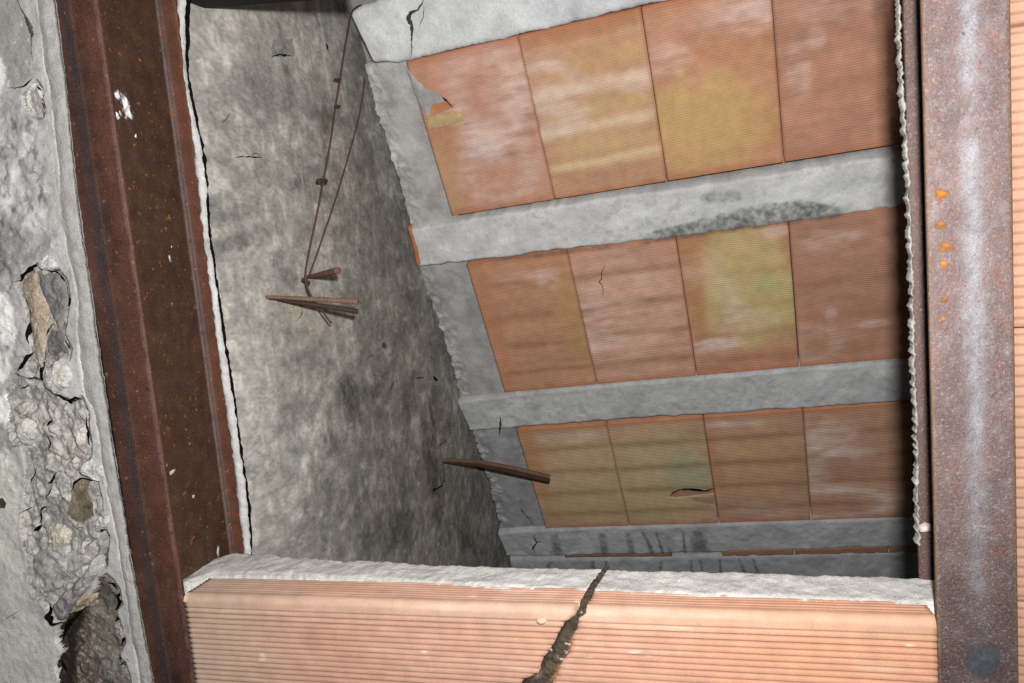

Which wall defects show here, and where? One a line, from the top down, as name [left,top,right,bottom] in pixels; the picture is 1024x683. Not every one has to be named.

crack [406,0,424,59]
spalling [431,96,452,113]
water stain [722,203,827,229]
corrosion [940,242,952,269]
spalling [5,255,131,683]
spalling [670,488,717,511]
crack [522,564,610,683]